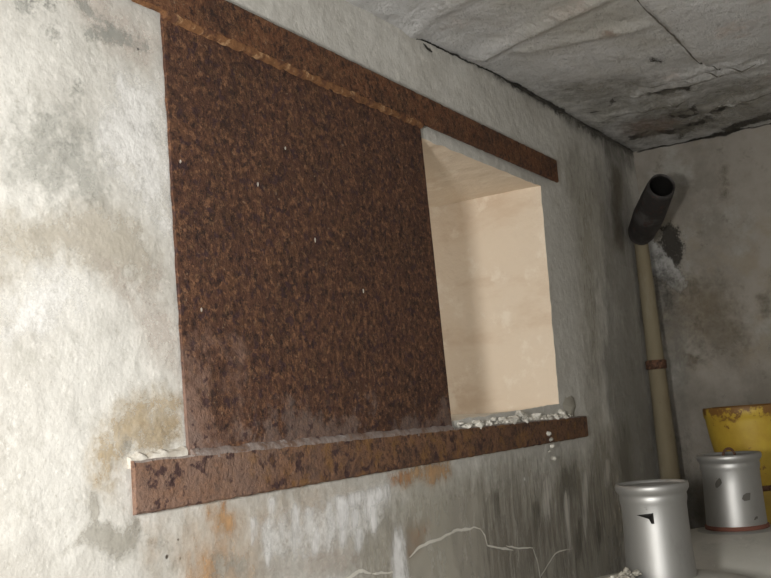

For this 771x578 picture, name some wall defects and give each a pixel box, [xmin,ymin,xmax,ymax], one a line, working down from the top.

crack [637,0,756,77]
leakage [95,396,179,483]
leakage [251,486,389,570]
crack [347,569,393,578]
leakage [392,530,408,578]
crack [409,526,571,578]